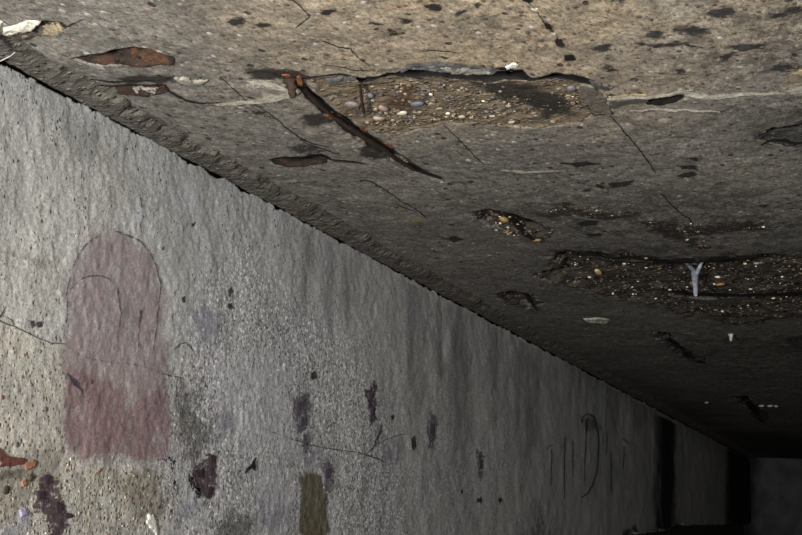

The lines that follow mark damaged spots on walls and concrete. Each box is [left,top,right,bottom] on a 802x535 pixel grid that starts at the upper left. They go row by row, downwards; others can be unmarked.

spalling [76,47,176,68]
corrosion [279,72,308,87]
crack [244,0,612,91]
spalling [770,64,794,72]
crack [90,75,341,156]
spalling [270,76,612,182]
crack [586,105,656,173]
spalling [755,121,802,147]
spalling [472,202,802,325]
crack [0,306,103,362]